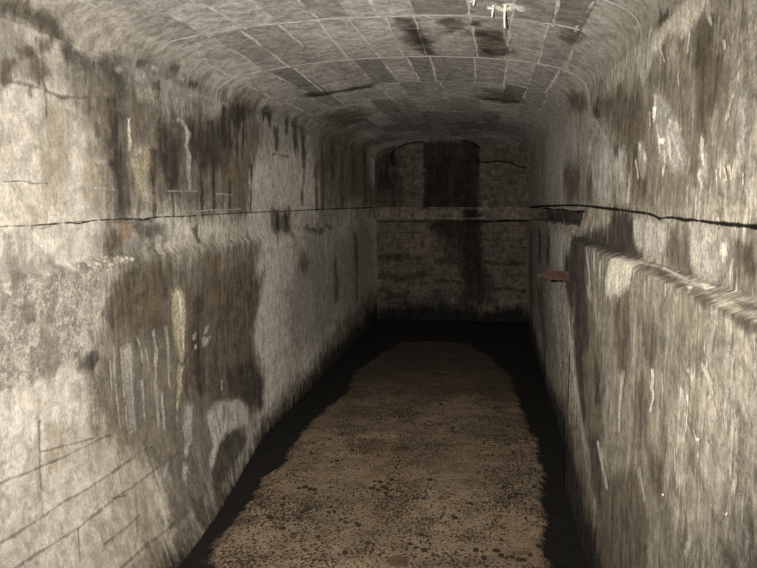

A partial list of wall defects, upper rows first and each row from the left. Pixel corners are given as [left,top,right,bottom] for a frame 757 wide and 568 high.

water stain [396,17,434,55]
water stain [439,3,539,56]
water stain [85,71,306,221]
water stain [314,110,400,210]
crack [1,204,757,230]
water stain [693,292,757,331]
water stain [82,141,691,568]
water stain [702,363,714,399]